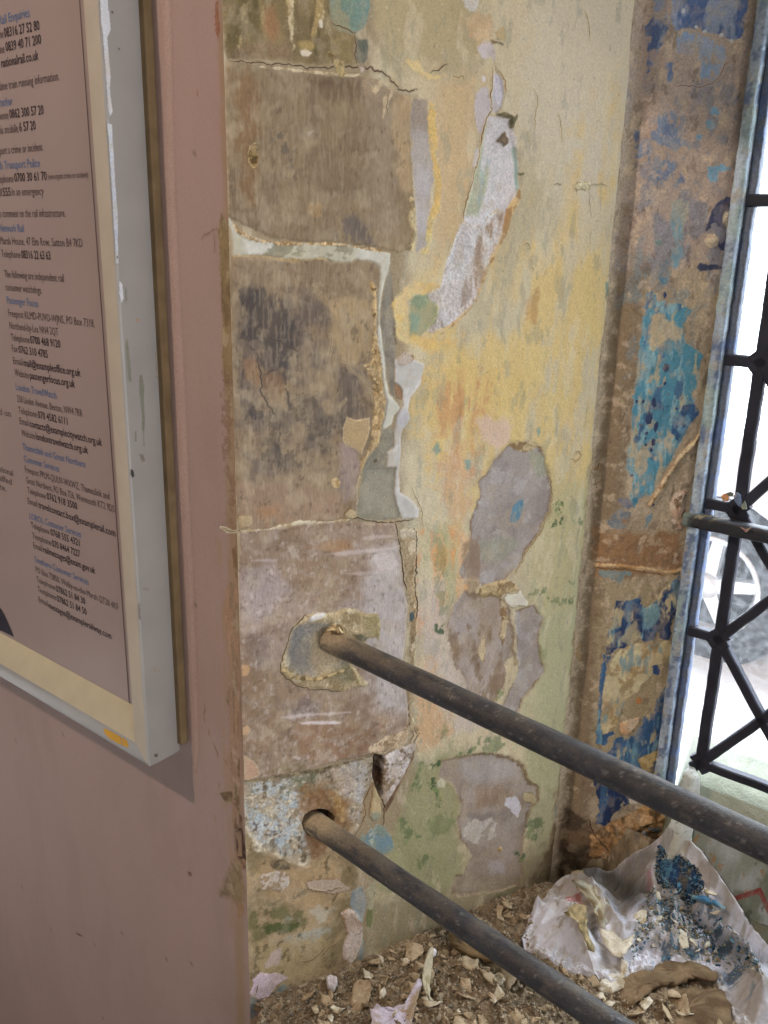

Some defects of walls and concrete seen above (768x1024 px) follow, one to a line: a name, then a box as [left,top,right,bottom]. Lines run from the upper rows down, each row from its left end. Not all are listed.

crack [229,20,418,116]
peeling [643,0,749,84]
peeling [426,0,525,336]
peeling [623,106,732,509]
flaking render [203,59,443,1024]
crack [220,466,426,666]
peeling [721,492,747,510]
crack [406,690,420,744]
flaking render [595,575,681,774]
rust [289,775,359,863]